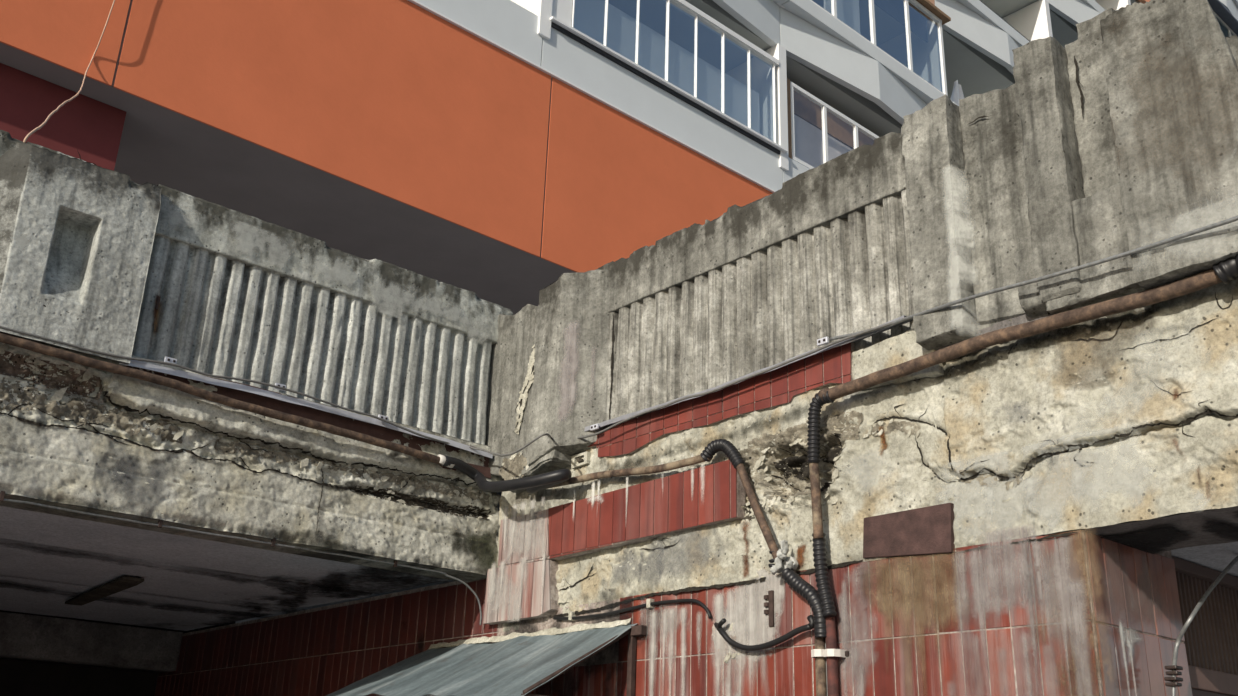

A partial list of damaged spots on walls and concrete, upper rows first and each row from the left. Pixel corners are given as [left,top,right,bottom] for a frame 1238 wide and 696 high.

crack [1074,56,1084,117]
crack [1069,292,1233,352]
spalling [0,345,185,444]
crack [0,388,486,532]
spalling [728,410,921,521]
crack [873,380,1238,483]
water stain [453,499,545,636]
water stain [944,427,1238,696]
water stain [536,638,623,696]
water stain [594,591,700,696]
water stain [714,570,784,696]
water stain [839,591,866,696]